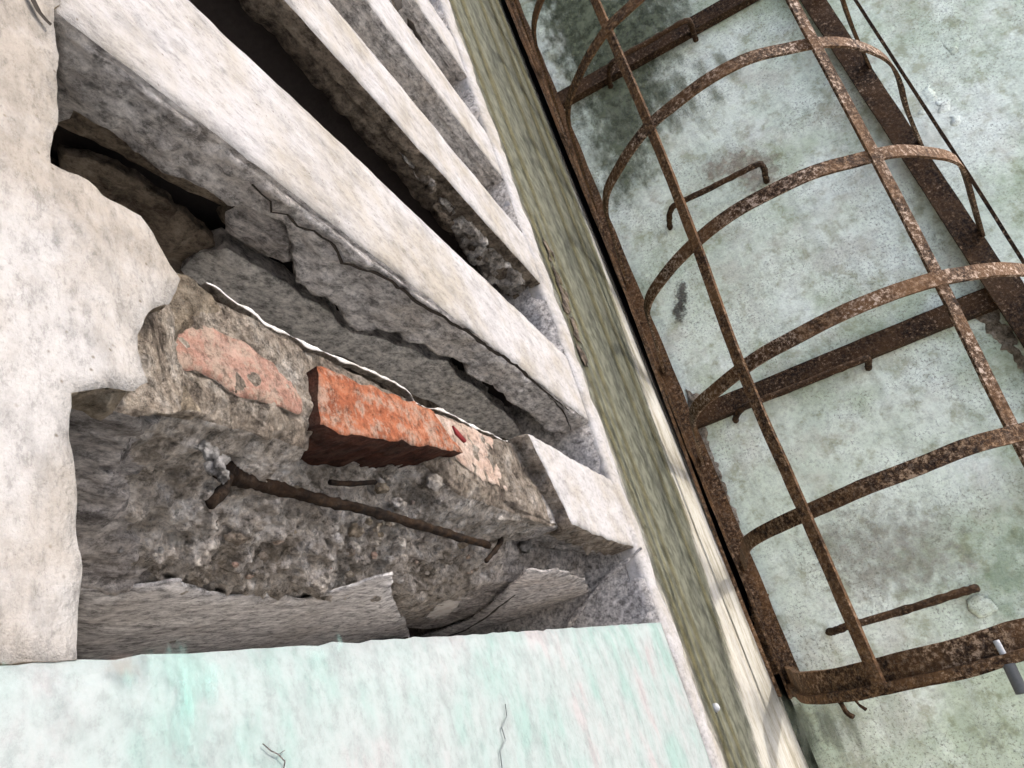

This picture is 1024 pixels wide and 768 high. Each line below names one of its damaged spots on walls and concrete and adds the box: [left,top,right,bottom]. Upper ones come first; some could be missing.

spalling [53,17,602,660]
crack [252,184,571,430]